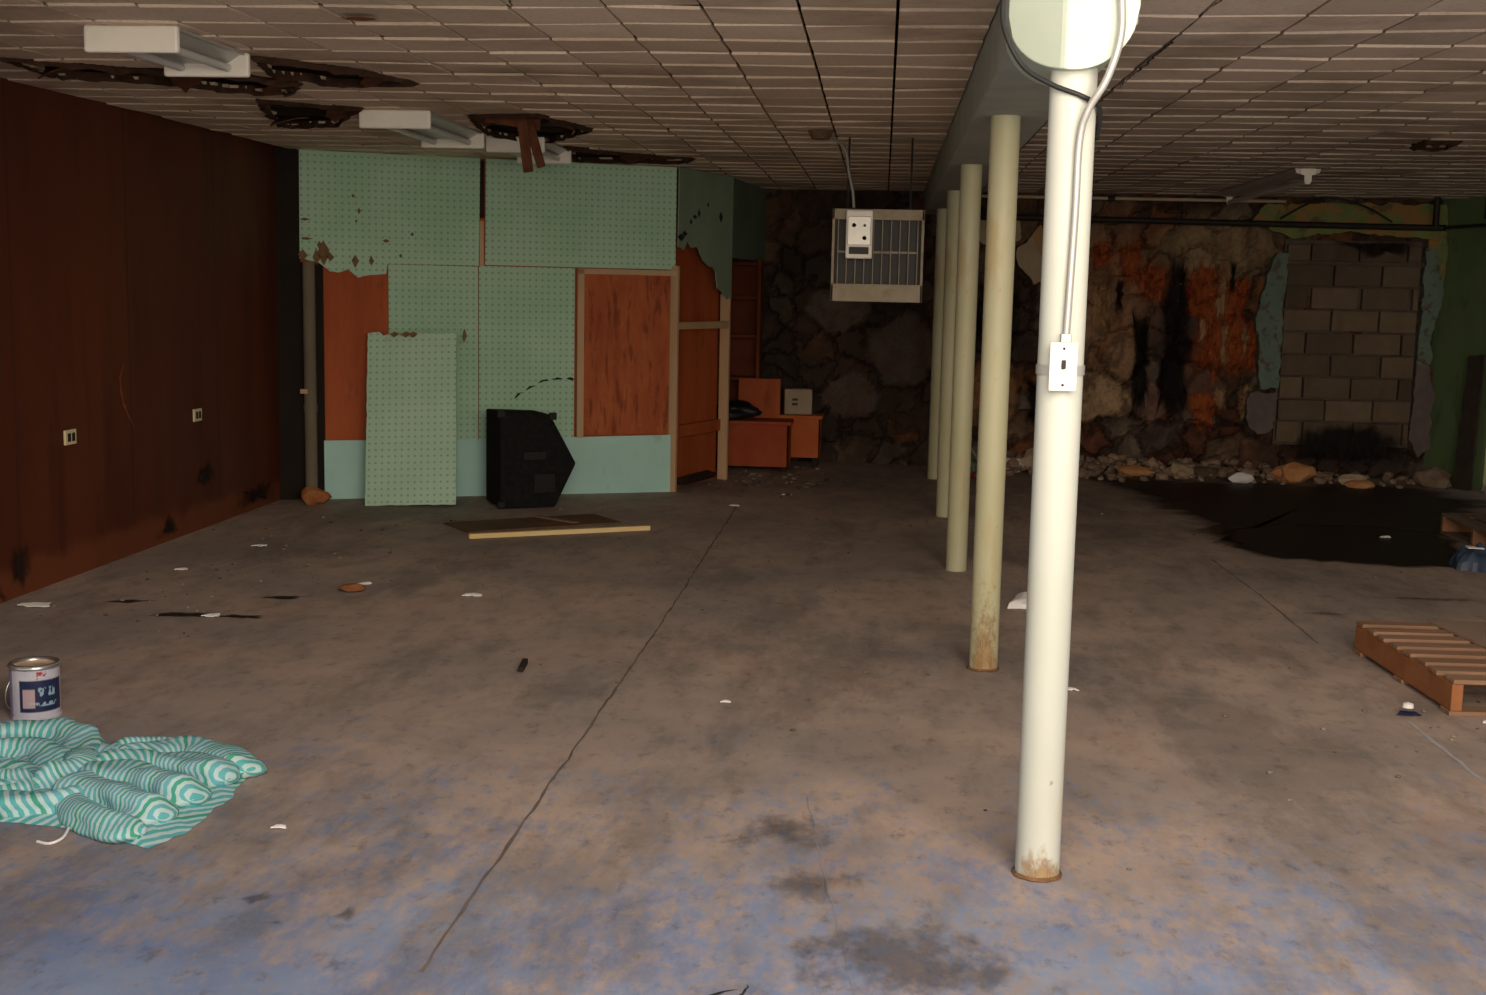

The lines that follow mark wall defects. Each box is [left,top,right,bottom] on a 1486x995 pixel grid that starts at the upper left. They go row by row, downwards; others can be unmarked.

peeling [298,218,334,265]